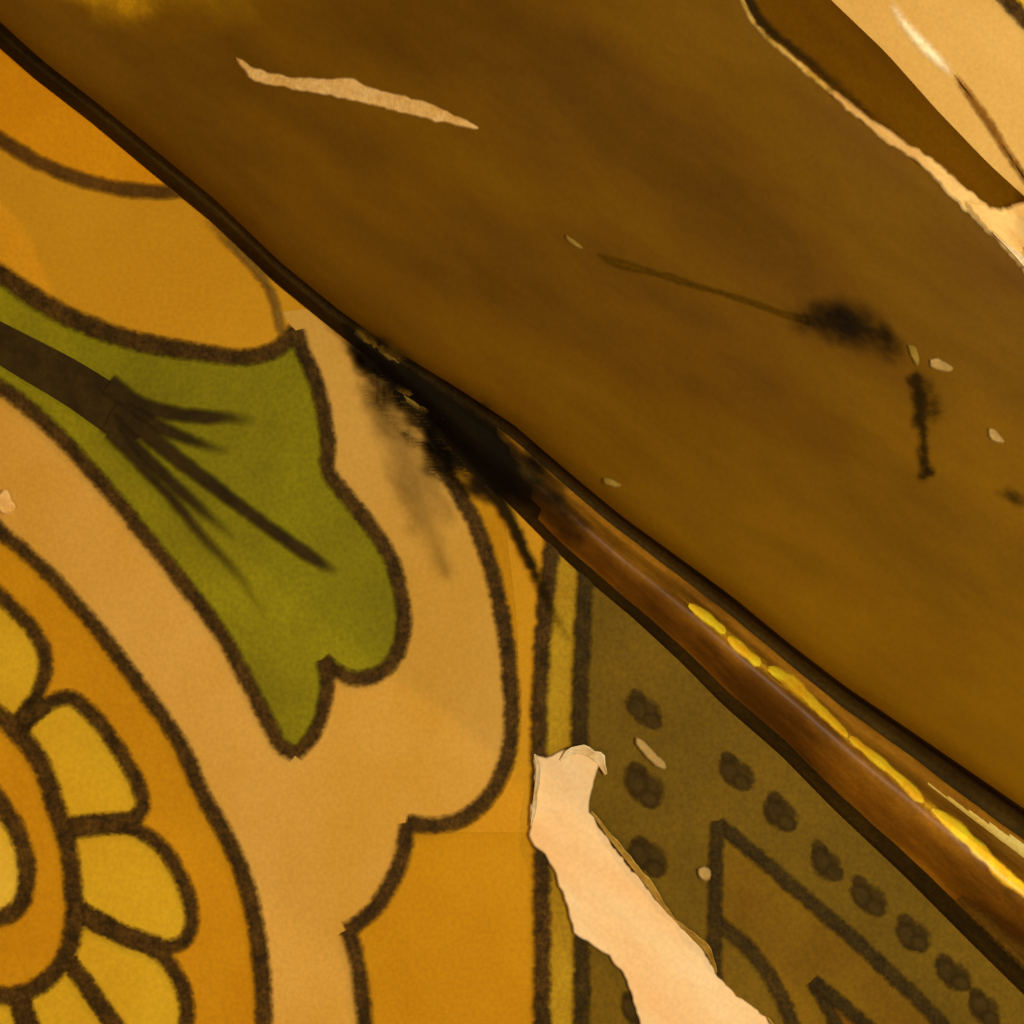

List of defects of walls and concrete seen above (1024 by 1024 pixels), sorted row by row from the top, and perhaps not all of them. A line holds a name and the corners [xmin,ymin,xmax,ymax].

flaking render [966,202,1024,270]
crack [605,258,893,350]
peeling [636,738,666,769]
peeling [530,745,774,1024]